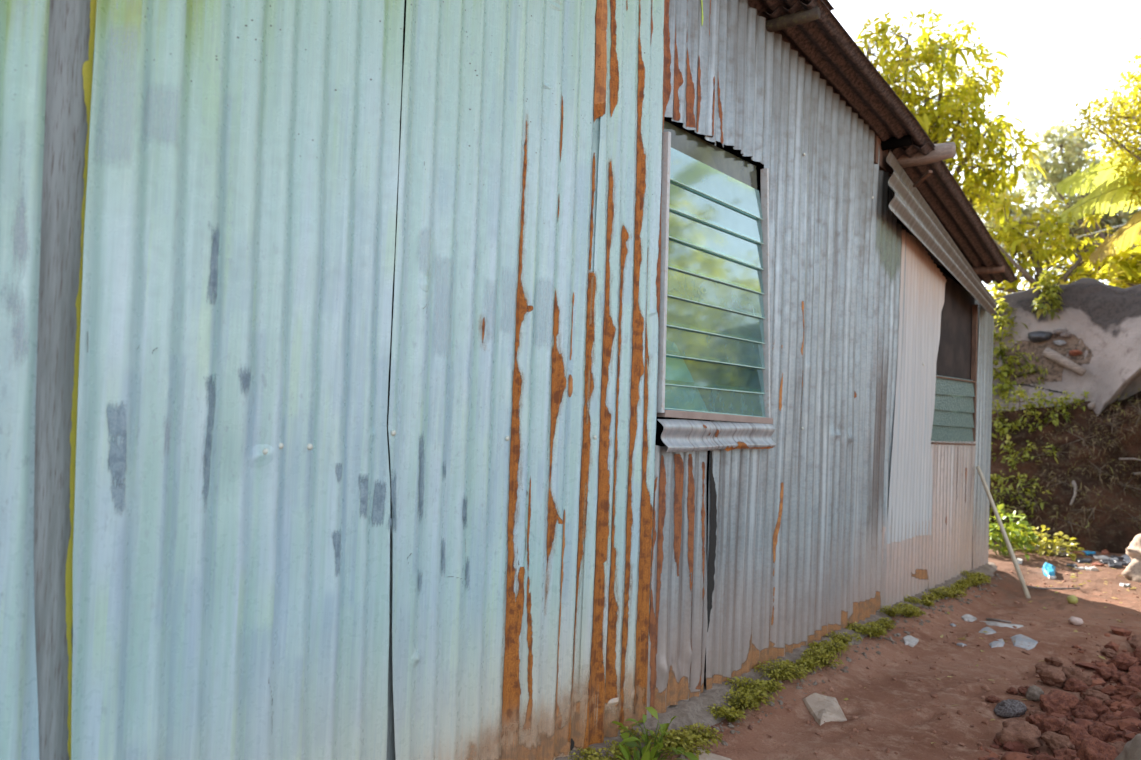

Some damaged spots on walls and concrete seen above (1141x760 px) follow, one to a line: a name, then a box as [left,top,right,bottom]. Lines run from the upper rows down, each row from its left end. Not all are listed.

corrosion [496,0,881,760]